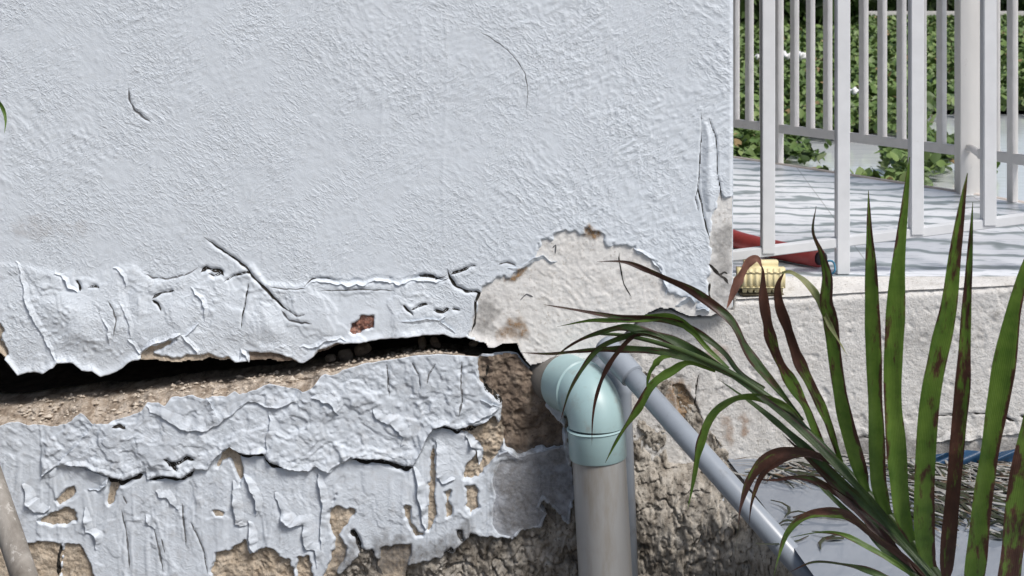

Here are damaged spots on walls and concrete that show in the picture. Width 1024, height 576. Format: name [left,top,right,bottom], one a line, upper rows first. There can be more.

crack [128,90,152,123]
crack [482,33,528,110]
crack [695,116,722,239]
crack [0,239,519,434]
flaking render [0,193,732,576]
crack [352,458,413,471]
peeling [643,372,766,509]
peeling [633,419,793,576]